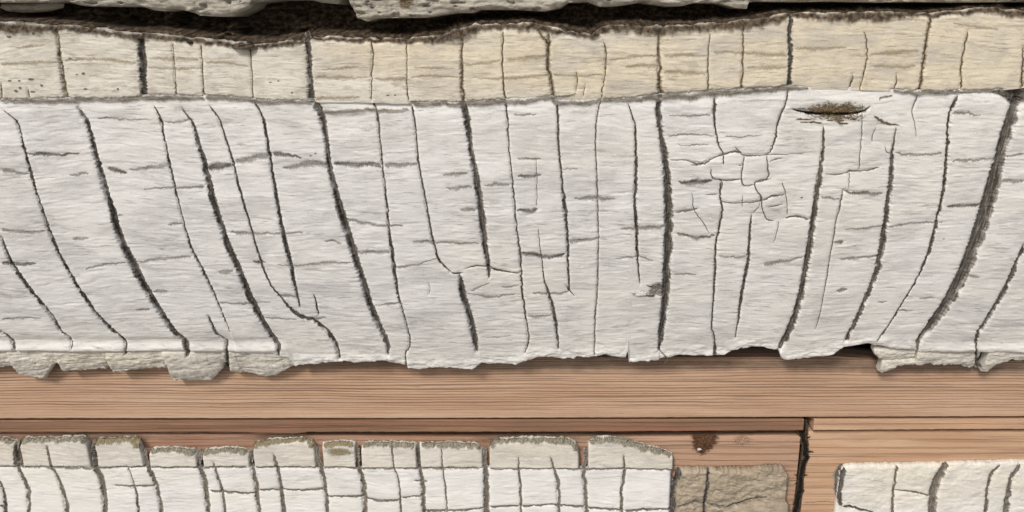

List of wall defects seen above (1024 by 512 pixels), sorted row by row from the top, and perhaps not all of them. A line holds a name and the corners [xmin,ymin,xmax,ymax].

crack [0,13,1024,368]
peeling [0,351,294,381]
peeling [871,344,1024,373]
peeling [0,434,673,469]
crack [0,440,765,512]
crack [789,419,949,512]
crack [984,464,1021,512]